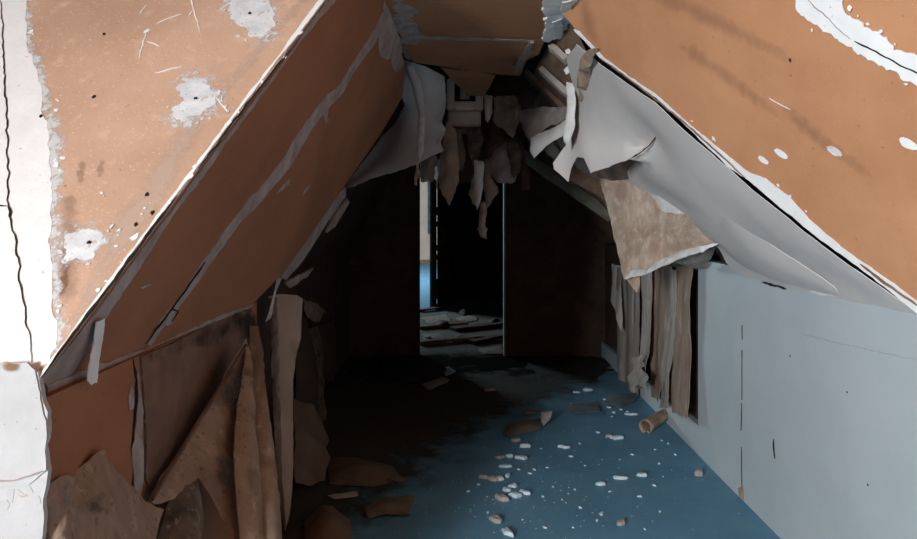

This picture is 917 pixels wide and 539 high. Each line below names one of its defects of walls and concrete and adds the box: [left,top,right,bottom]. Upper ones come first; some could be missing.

crack [0,2,32,362]